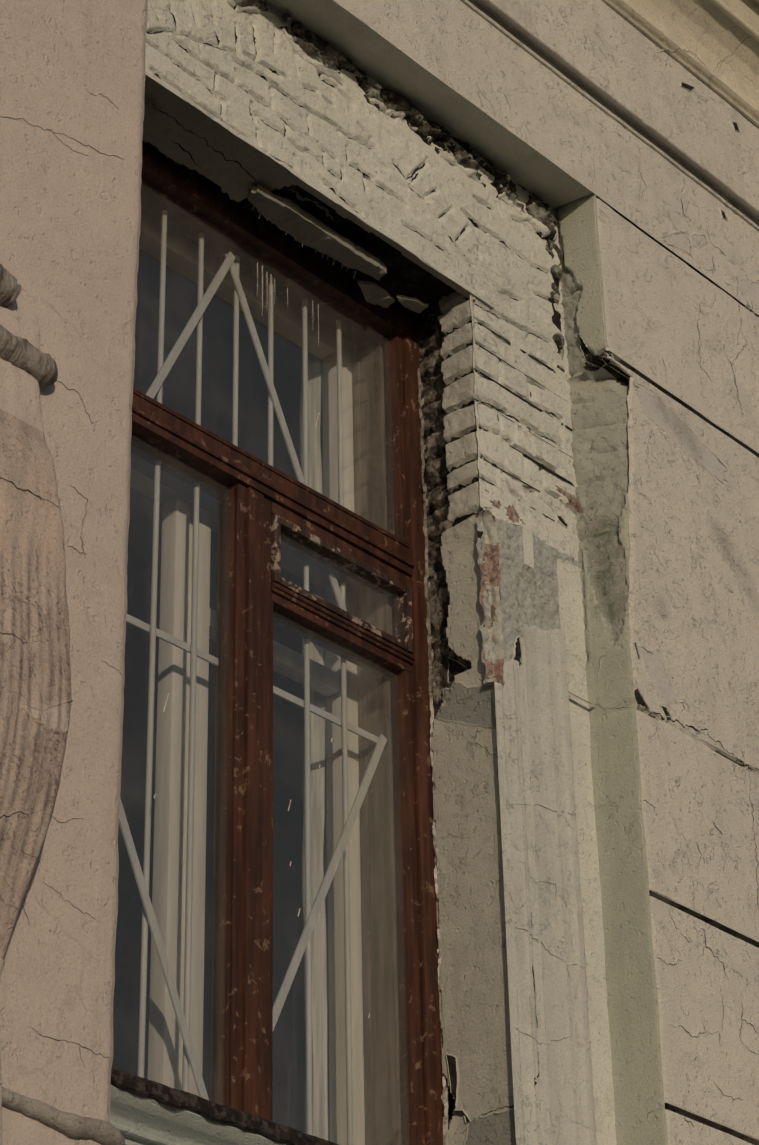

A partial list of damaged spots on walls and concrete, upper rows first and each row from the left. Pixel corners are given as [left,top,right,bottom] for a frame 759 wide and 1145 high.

flaking render [227,0,269,14]
crack [0,115,124,159]
flaking render [248,183,428,313]
flaking render [280,13,565,371]
crack [57,380,93,423]
spalling [579,333,630,390]
crack [666,199,759,417]
crack [0,474,89,555]
peeling [426,618,497,734]
spalling [512,635,523,668]
crack [568,650,759,908]
crack [655,909,759,1054]